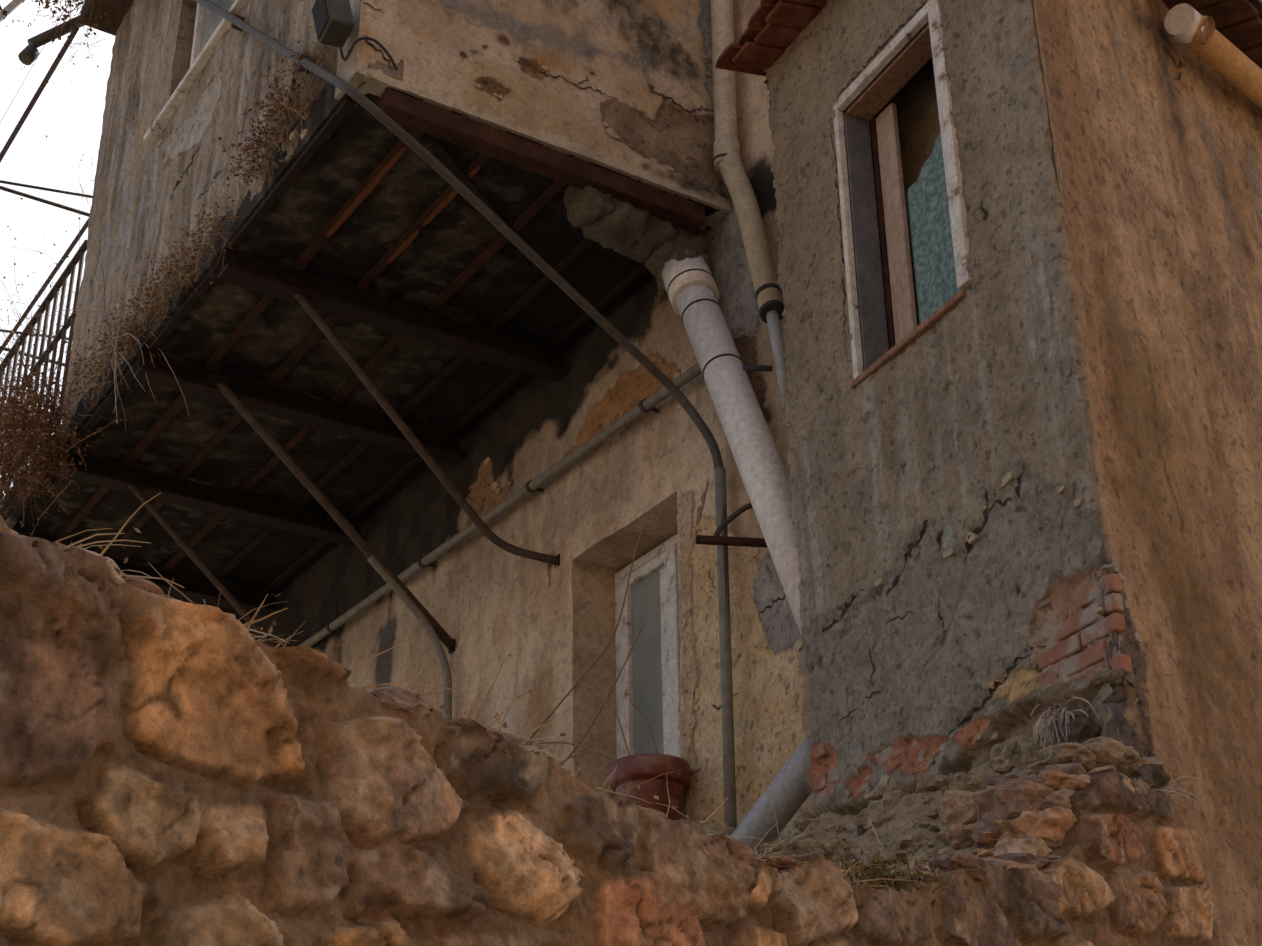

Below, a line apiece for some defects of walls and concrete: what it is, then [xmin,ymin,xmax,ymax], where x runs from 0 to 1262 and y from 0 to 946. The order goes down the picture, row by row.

crack [521,60,616,99]
leakage [621,17,697,77]
spalling [600,0,729,197]
crack [648,85,712,122]
peeling [563,353,681,458]
crack [822,472,1023,729]
peeling [677,460,1171,842]
crack [948,646,1046,735]